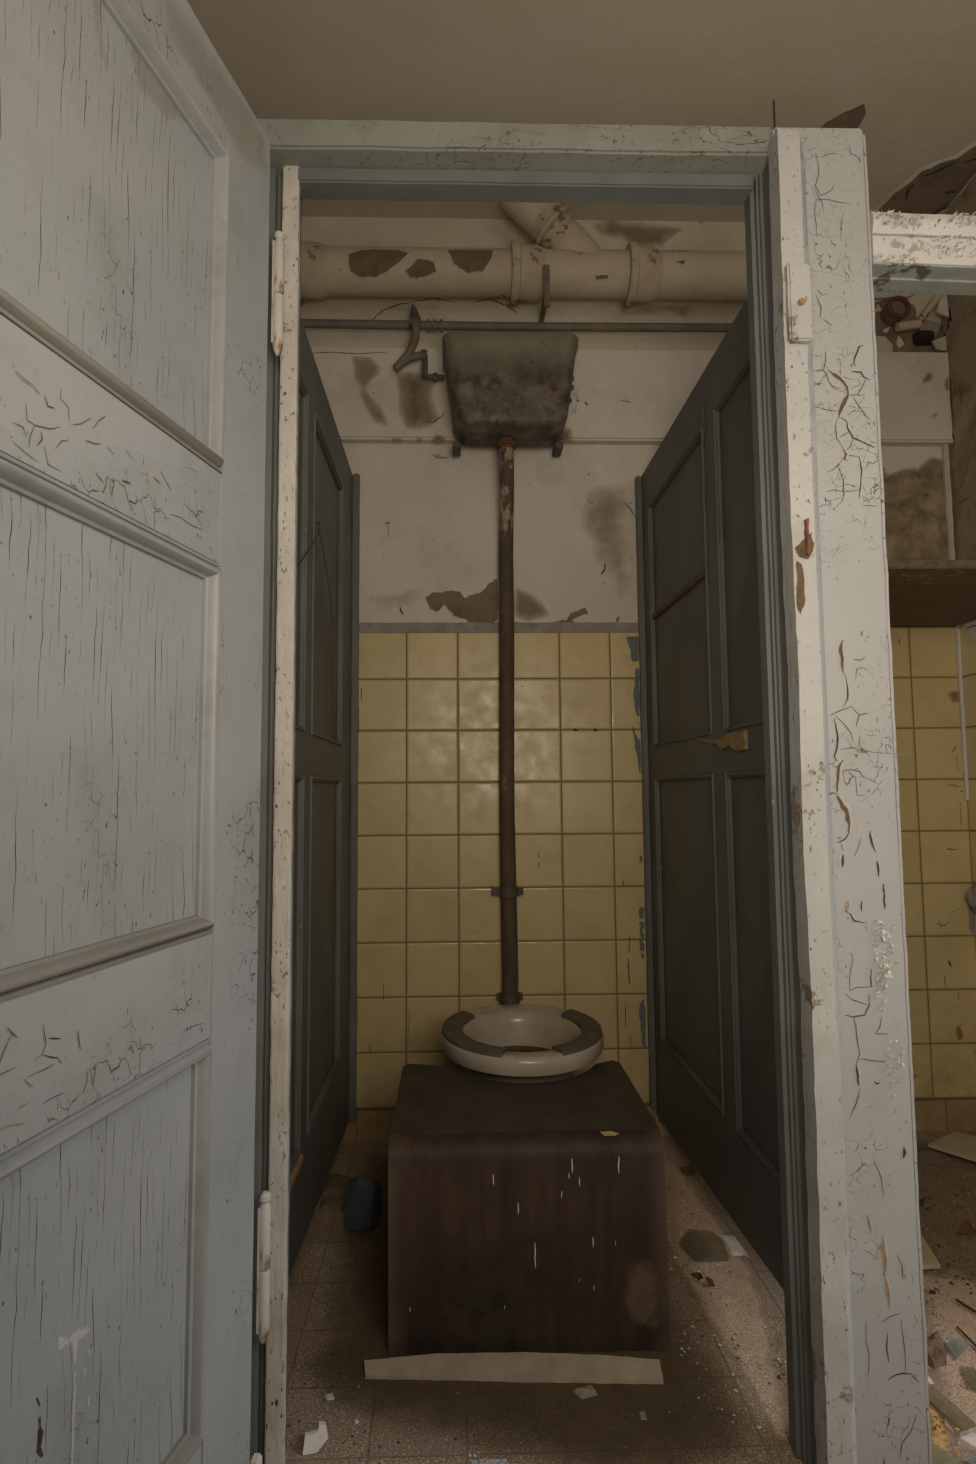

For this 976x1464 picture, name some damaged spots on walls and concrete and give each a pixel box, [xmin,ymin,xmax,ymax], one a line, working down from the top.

crack [814,145,861,237]
peeling [869,141,976,258]
crack [13,371,204,530]
crack [816,293,905,530]
peeling [874,295,976,560]
peeling [425,578,499,623]
flaking render [553,606,589,622]
crack [830,631,886,1117]
crack [0,1024,81,1131]
crack [866,1147,918,1464]